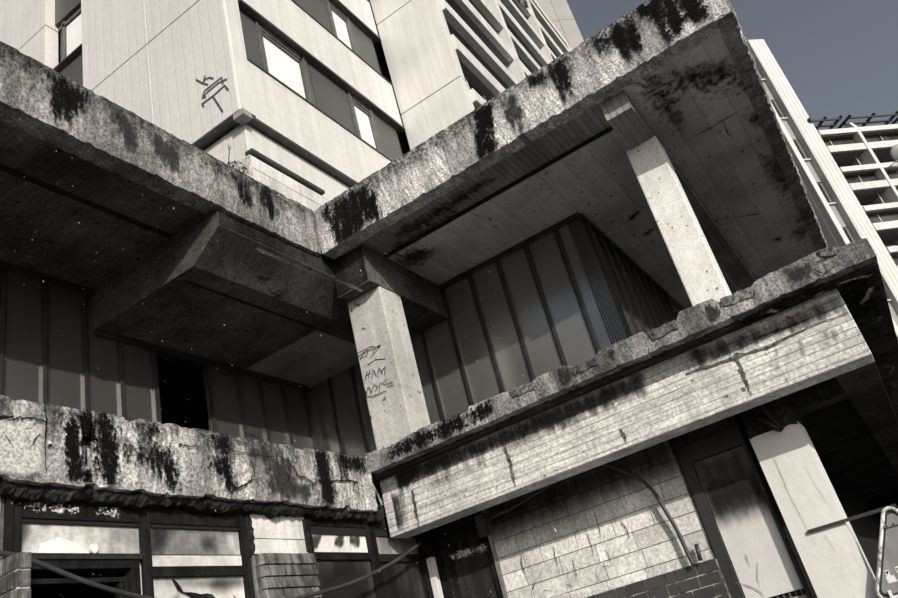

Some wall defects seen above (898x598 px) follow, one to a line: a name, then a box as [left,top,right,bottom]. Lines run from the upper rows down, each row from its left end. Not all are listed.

damp [591,0,713,64]
damp [45,69,90,126]
damp [469,93,530,158]
damp [525,56,573,103]
crack [693,108,744,137]
damp [232,174,280,220]
damp [320,184,385,244]
damp [58,406,183,491]
damp [206,432,238,494]
crack [226,450,361,491]
damp [256,445,371,504]
damp [380,375,645,527]